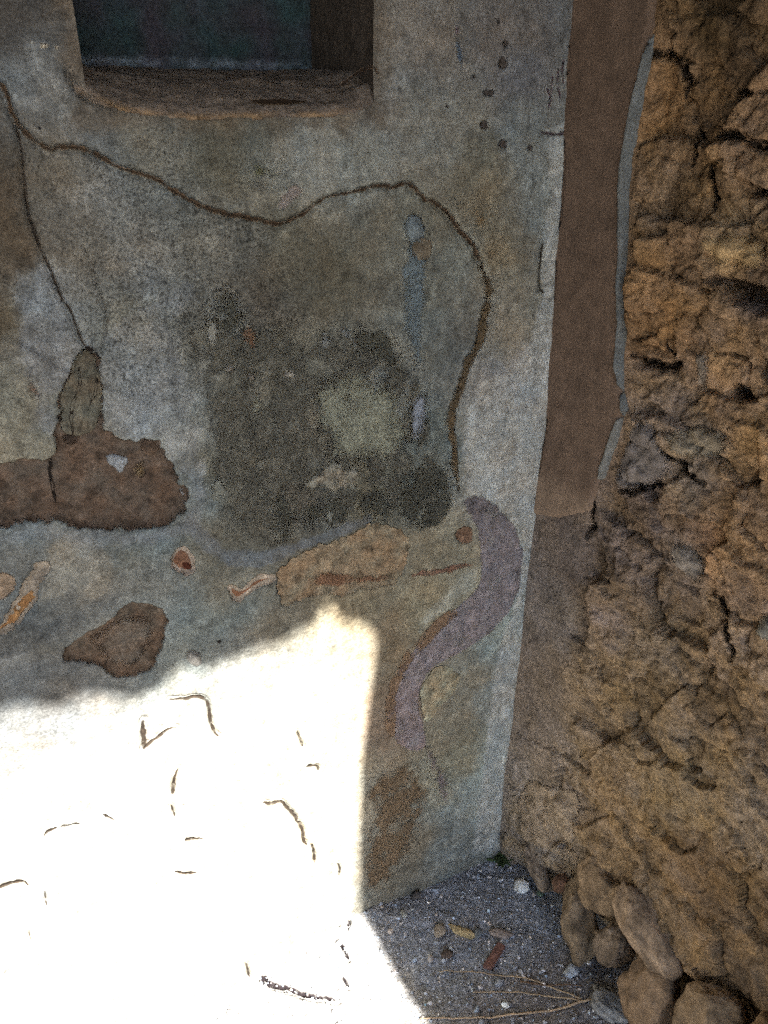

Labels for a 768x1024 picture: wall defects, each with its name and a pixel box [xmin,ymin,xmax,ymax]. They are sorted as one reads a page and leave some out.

crack [0,82,493,491]
spalling [0,346,189,531]
water stain [190,294,451,542]
peeling [227,523,410,607]
spalling [63,602,169,678]
crack [140,720,177,750]
crack [170,694,219,736]
crack [297,730,319,770]
crack [171,768,179,816]
crack [263,800,341,875]
crack [0,879,47,905]
crack [246,921,351,1002]